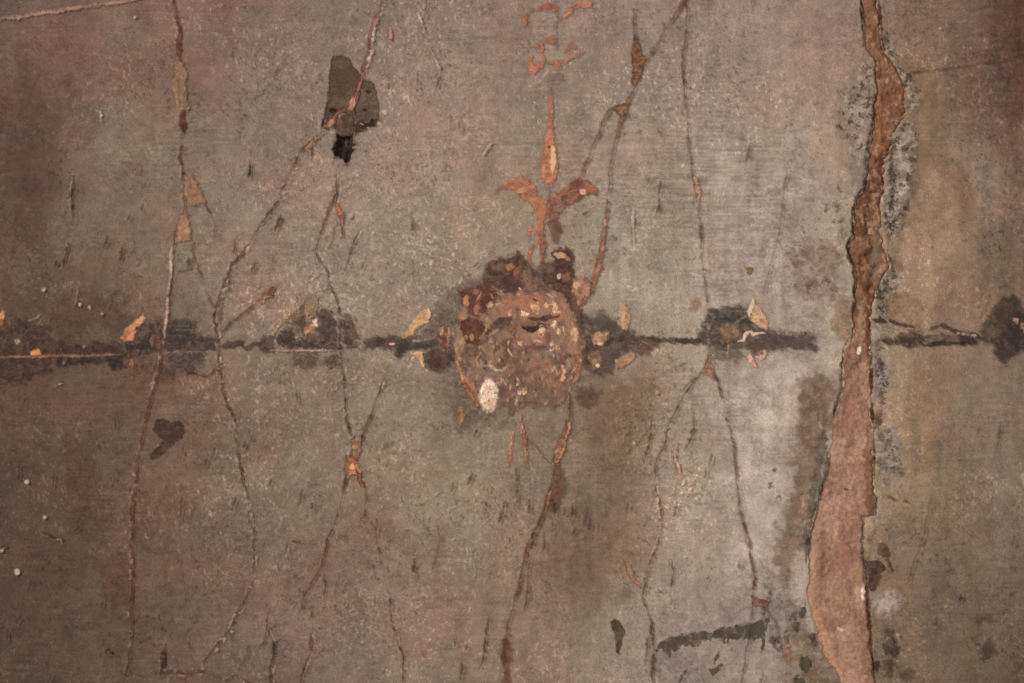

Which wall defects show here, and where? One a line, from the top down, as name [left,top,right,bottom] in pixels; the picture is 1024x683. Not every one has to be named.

spalling [322,56,379,165]
water stain [57,294,135,340]
water stain [151,419,184,459]
crack [127,0,384,683]
flaking render [479,379,499,412]
crack [483,395,572,683]
crack [581,0,786,683]
water stain [656,342,825,683]
crack [805,0,960,683]